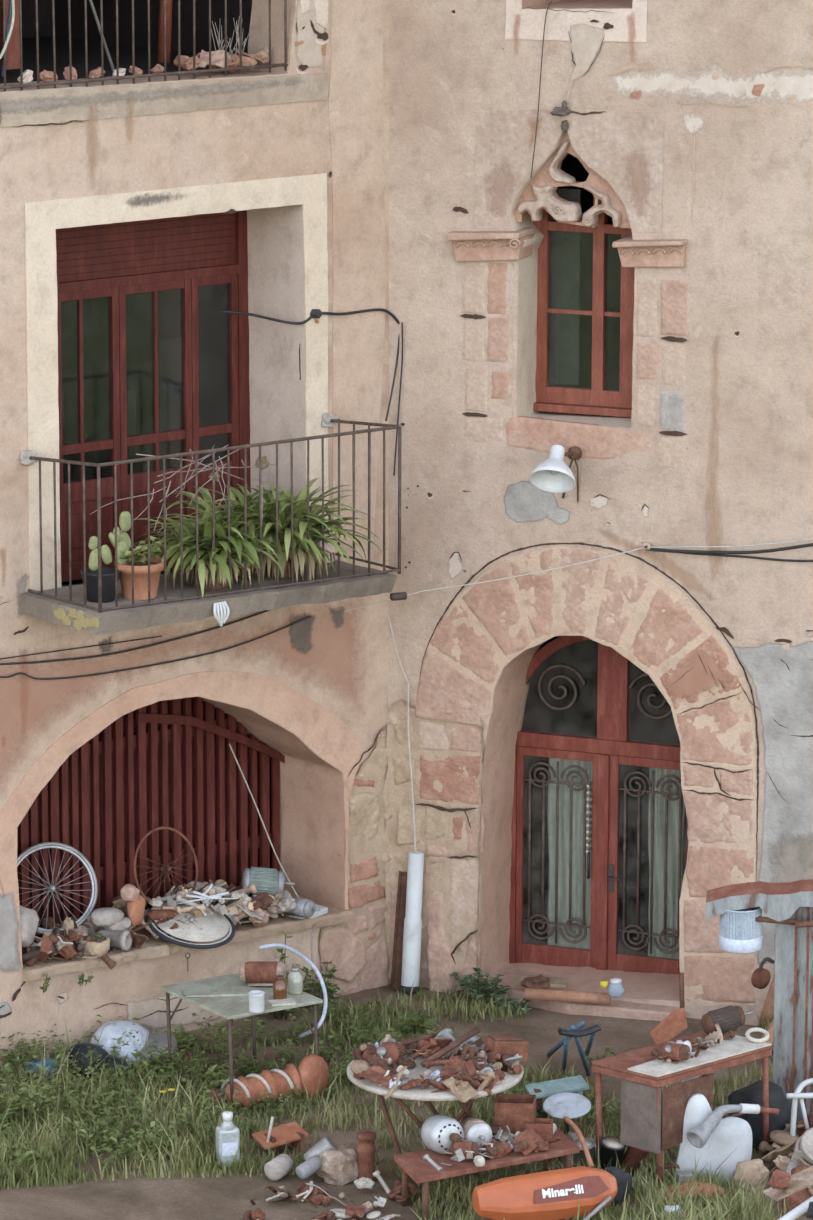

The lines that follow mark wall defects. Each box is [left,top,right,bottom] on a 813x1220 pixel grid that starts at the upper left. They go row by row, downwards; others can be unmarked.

crack [523,6,610,14]
spalling [296,0,330,75]
flaking render [610,65,813,133]
spalling [504,481,570,524]
spalling [590,494,611,508]
spalling [449,552,467,578]
spalling [667,630,813,883]
spalling [758,910,776,964]